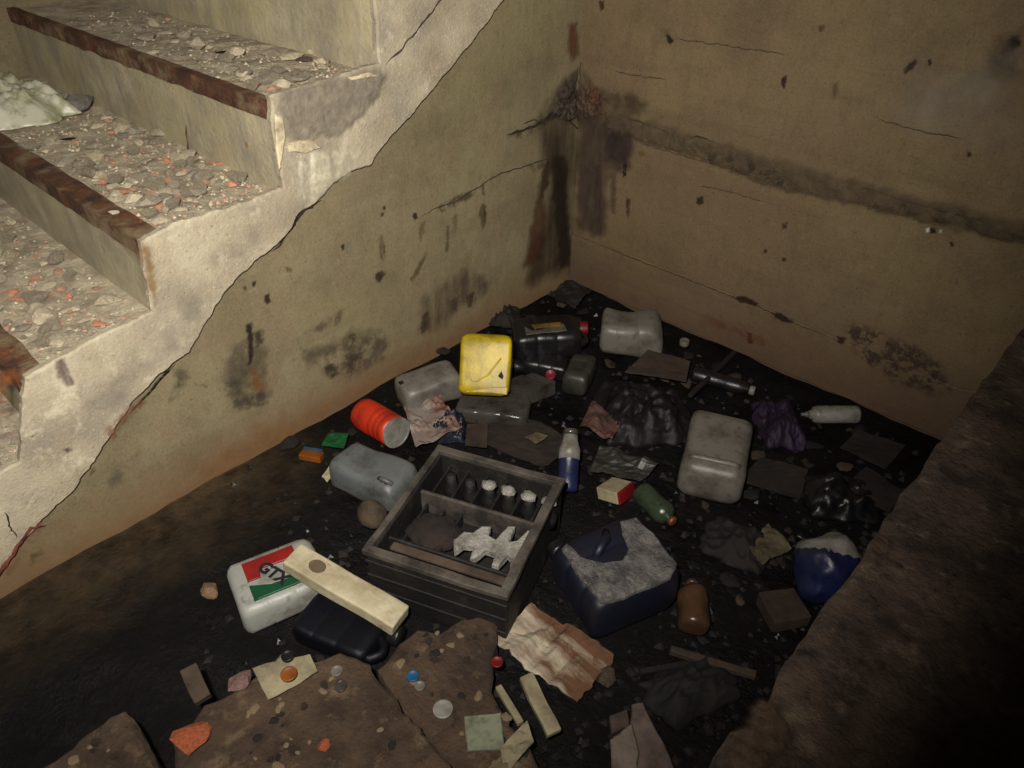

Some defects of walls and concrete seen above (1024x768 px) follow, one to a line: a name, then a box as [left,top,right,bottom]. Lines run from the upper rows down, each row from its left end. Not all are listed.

crack [386,0,441,64]
crack [681,39,785,55]
crack [508,111,553,135]
crack [880,119,958,138]
crack [274,200,322,250]
crack [432,157,551,210]
damp [529,114,631,283]
damp [229,324,264,406]
damp [307,336,386,377]
crack [110,364,174,435]
crack [0,512,45,574]